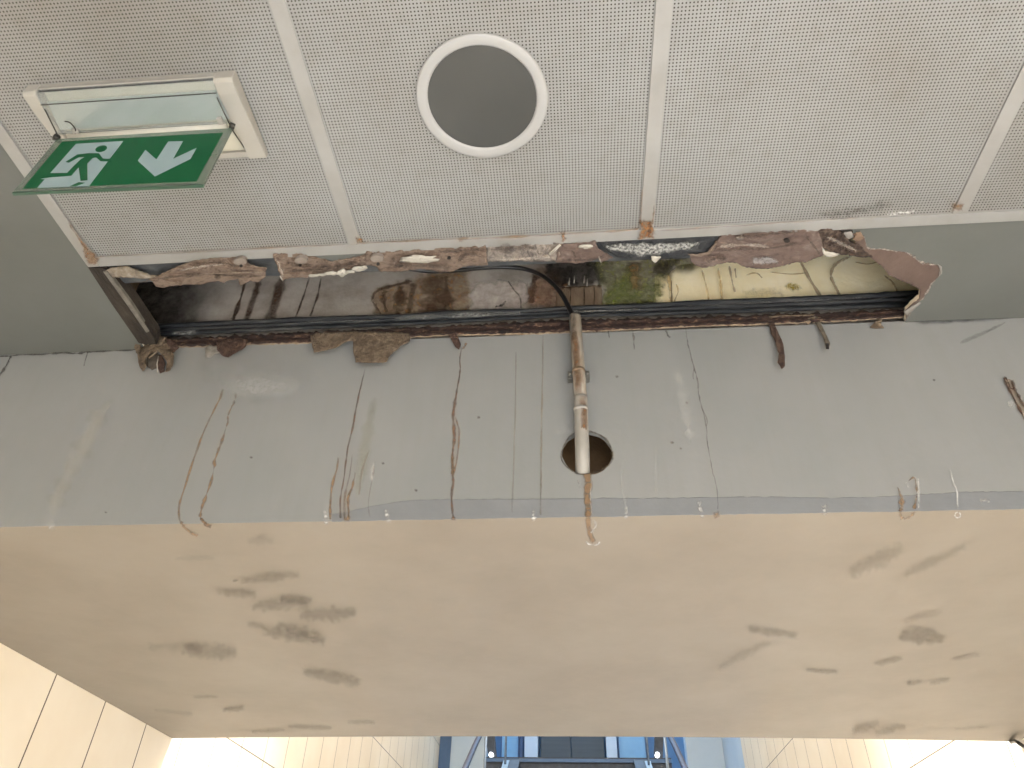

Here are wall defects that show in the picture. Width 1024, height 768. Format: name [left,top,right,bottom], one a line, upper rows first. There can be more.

leakage [330,272,492,322]
leakage [546,262,606,286]
peeling [606,242,698,263]
flaking render [654,231,942,319]
rust [165,271,904,546]
crack [665,331,719,518]